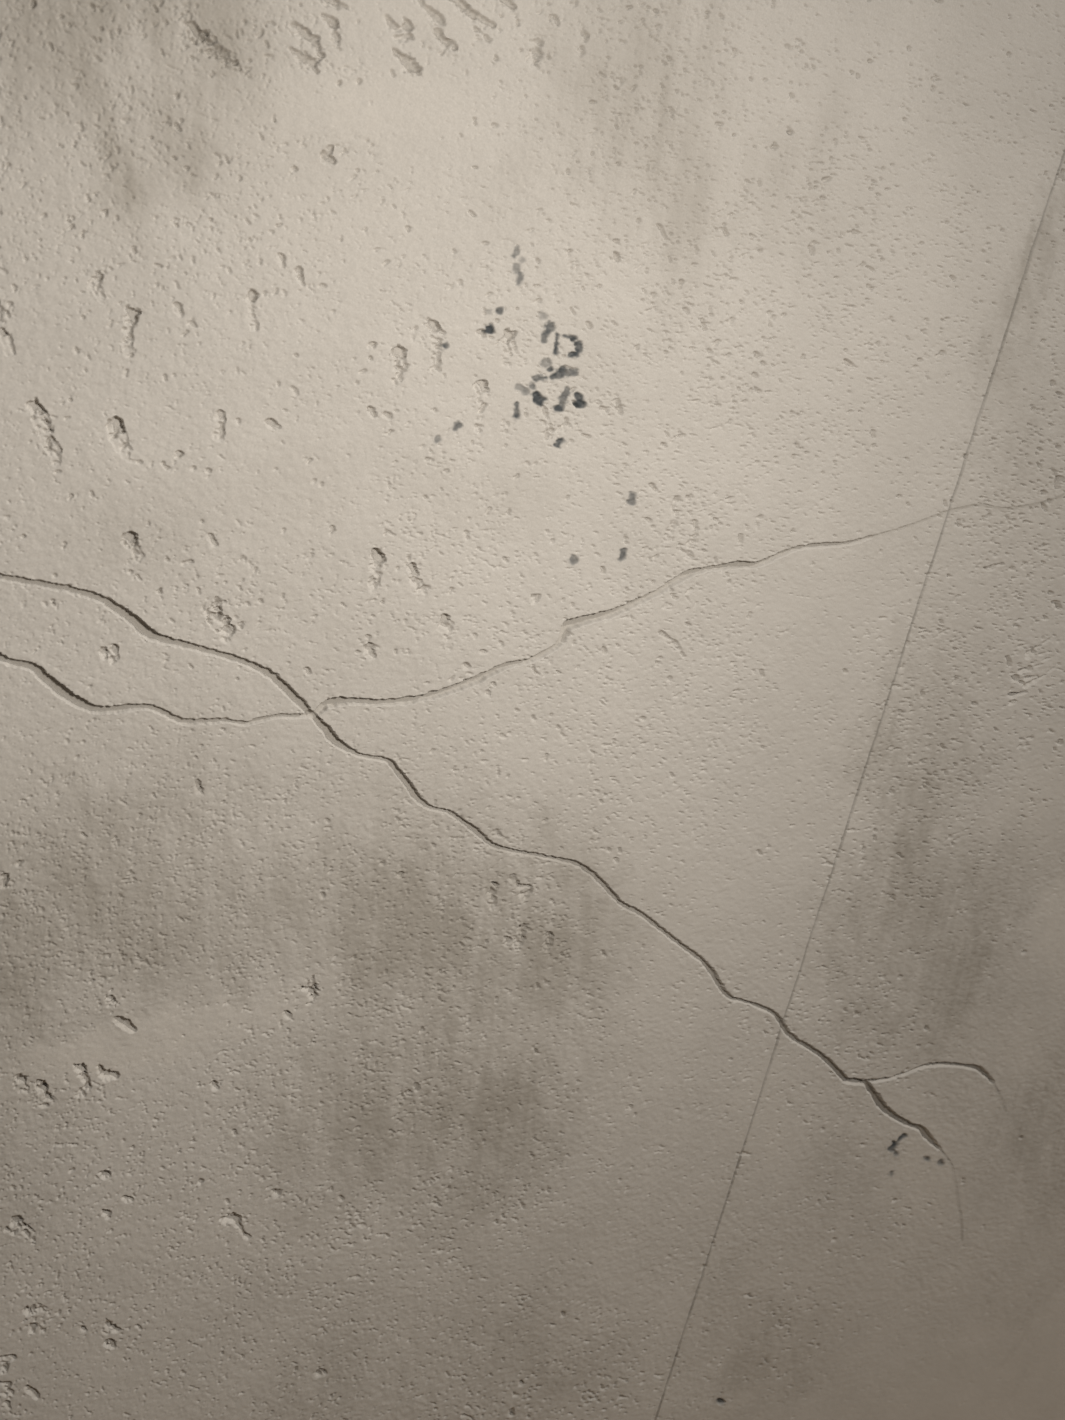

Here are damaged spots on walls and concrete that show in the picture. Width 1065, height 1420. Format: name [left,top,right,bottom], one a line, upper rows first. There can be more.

crack [0,492,1065,1240]